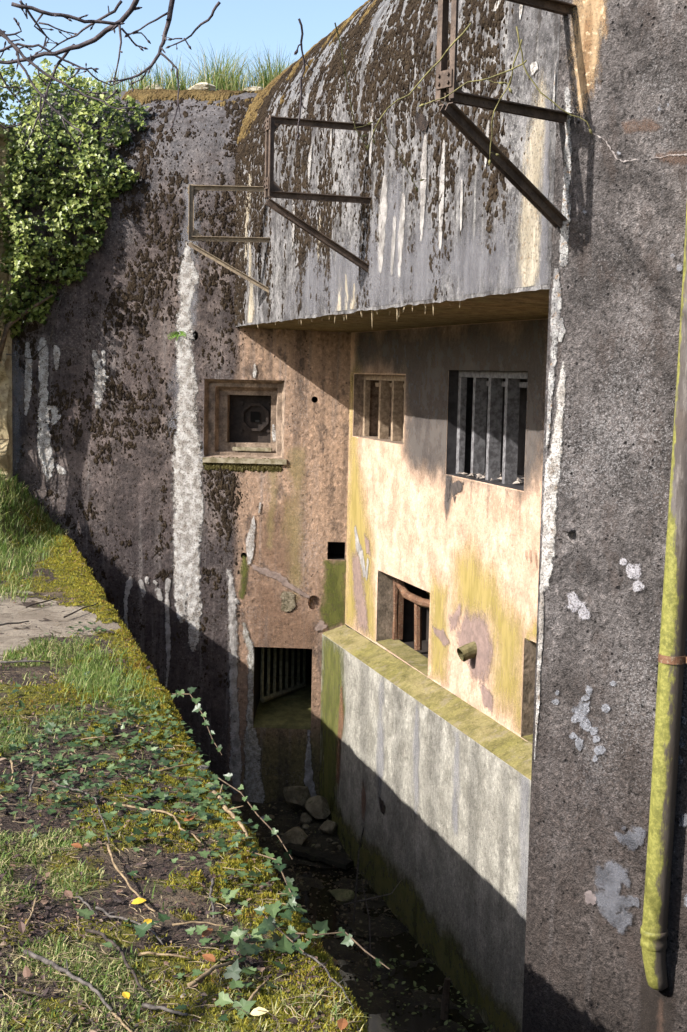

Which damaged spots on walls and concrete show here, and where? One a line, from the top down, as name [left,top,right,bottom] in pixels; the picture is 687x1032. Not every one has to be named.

rust [571,0,607,111]
water stain [523,62,556,198]
water stain [289,135,548,315]
efflorescence [24,337,67,481]
efflorescence [123,242,204,687]
water stain [226,502,265,803]
water stain [304,319,566,1032]
peeling [567,592,589,619]
peeling [569,686,610,762]
peeling [620,558,644,591]
peeling [595,861,639,934]
peeling [615,826,645,850]